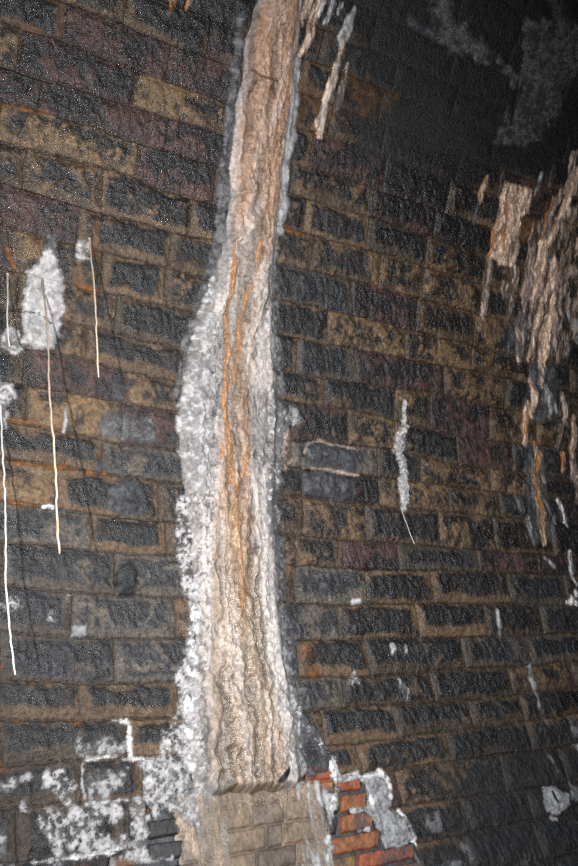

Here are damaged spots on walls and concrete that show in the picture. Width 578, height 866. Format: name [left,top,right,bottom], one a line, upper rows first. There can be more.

damp [314,39,349,139]
damp [276,406,301,470]
damp [392,399,410,512]
damp [0,718,229,866]
flaking render [108,761,424,866]